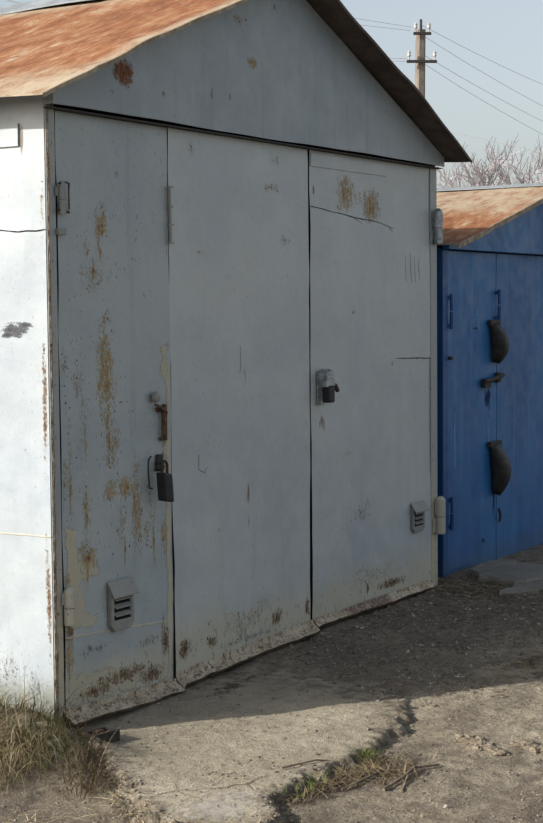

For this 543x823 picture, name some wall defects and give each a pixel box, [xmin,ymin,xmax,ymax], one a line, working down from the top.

corrosion [114,59,134,88]
crack [0,226,45,234]
corrosion [81,202,108,290]
crack [311,206,394,232]
corrosion [335,175,381,222]
water stain [2,322,33,338]
corrosion [42,335,55,452]
corrosion [97,313,127,468]
corrosion [44,404,98,586]
corrosion [103,464,167,562]
corrosion [358,566,405,594]
corrosion [72,661,164,702]